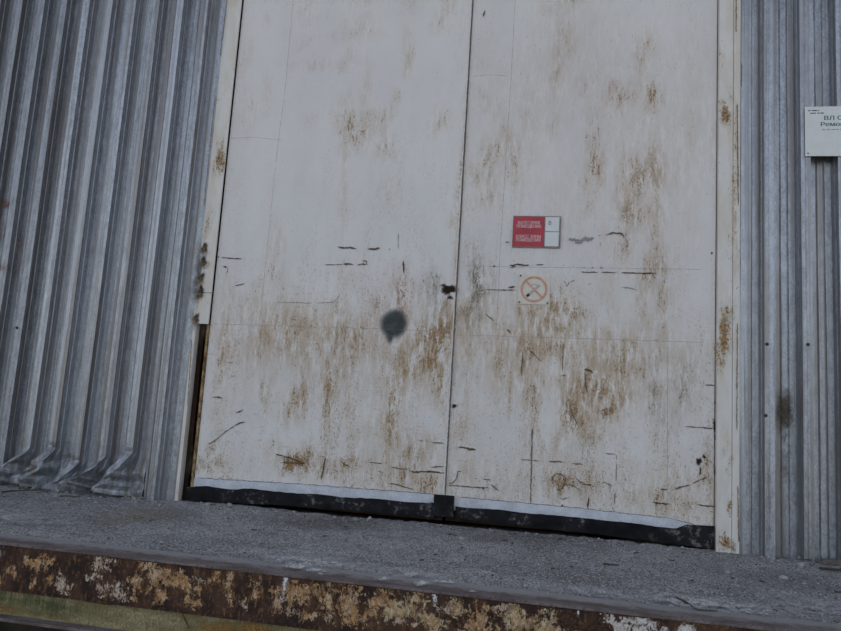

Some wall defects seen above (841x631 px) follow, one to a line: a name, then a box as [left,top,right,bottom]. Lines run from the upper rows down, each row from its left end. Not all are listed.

corrosion [717,96,741,217]
corrosion [273,383,422,491]
corrosion [258,245,494,444]
corrosion [487,281,658,504]
corrosion [713,307,738,427]
corrosion [554,609,614,631]
peeling [599,613,696,631]